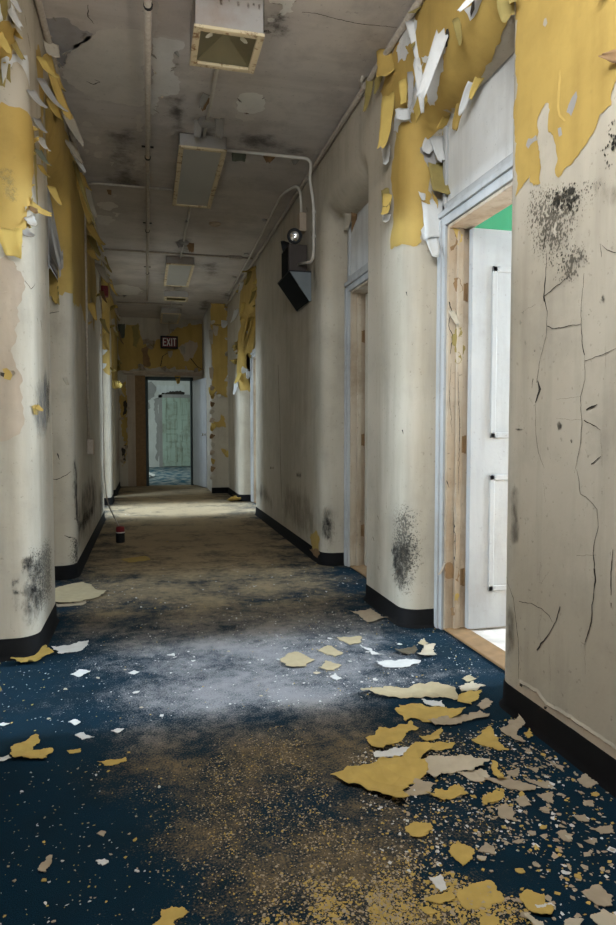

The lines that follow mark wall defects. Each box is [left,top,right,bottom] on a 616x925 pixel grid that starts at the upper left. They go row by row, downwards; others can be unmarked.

peeling [358,0,616,257]
peeling [0,0,265,480]
water stain [527,182,592,281]
crack [530,222,616,645]
peeling [11,645,54,663]
water stain [14,537,53,612]
peeling [55,582,106,607]
water stain [392,505,420,593]
crack [507,581,560,680]
peeling [0,734,54,761]
peeling [67,732,92,754]
peeling [97,757,127,766]